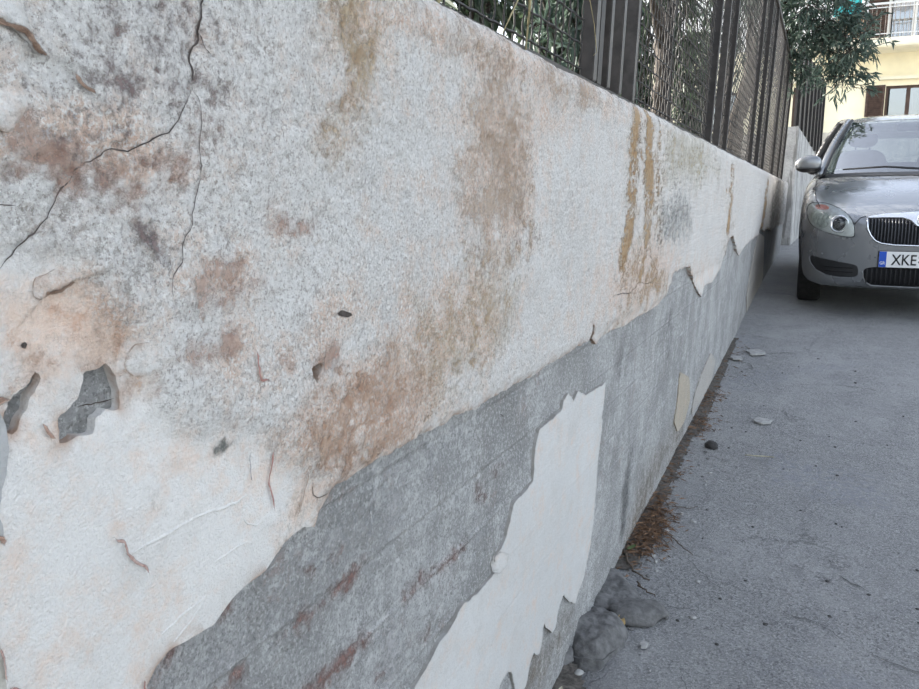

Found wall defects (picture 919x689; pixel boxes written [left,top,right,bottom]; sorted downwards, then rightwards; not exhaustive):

crack [1,0,210,292]
corrosion [619,106,669,305]
peeling [0,377,32,503]
flaking render [43,366,112,440]
flaking render [144,224,783,689]
peeling [116,539,149,572]
peeling [0,646,19,689]